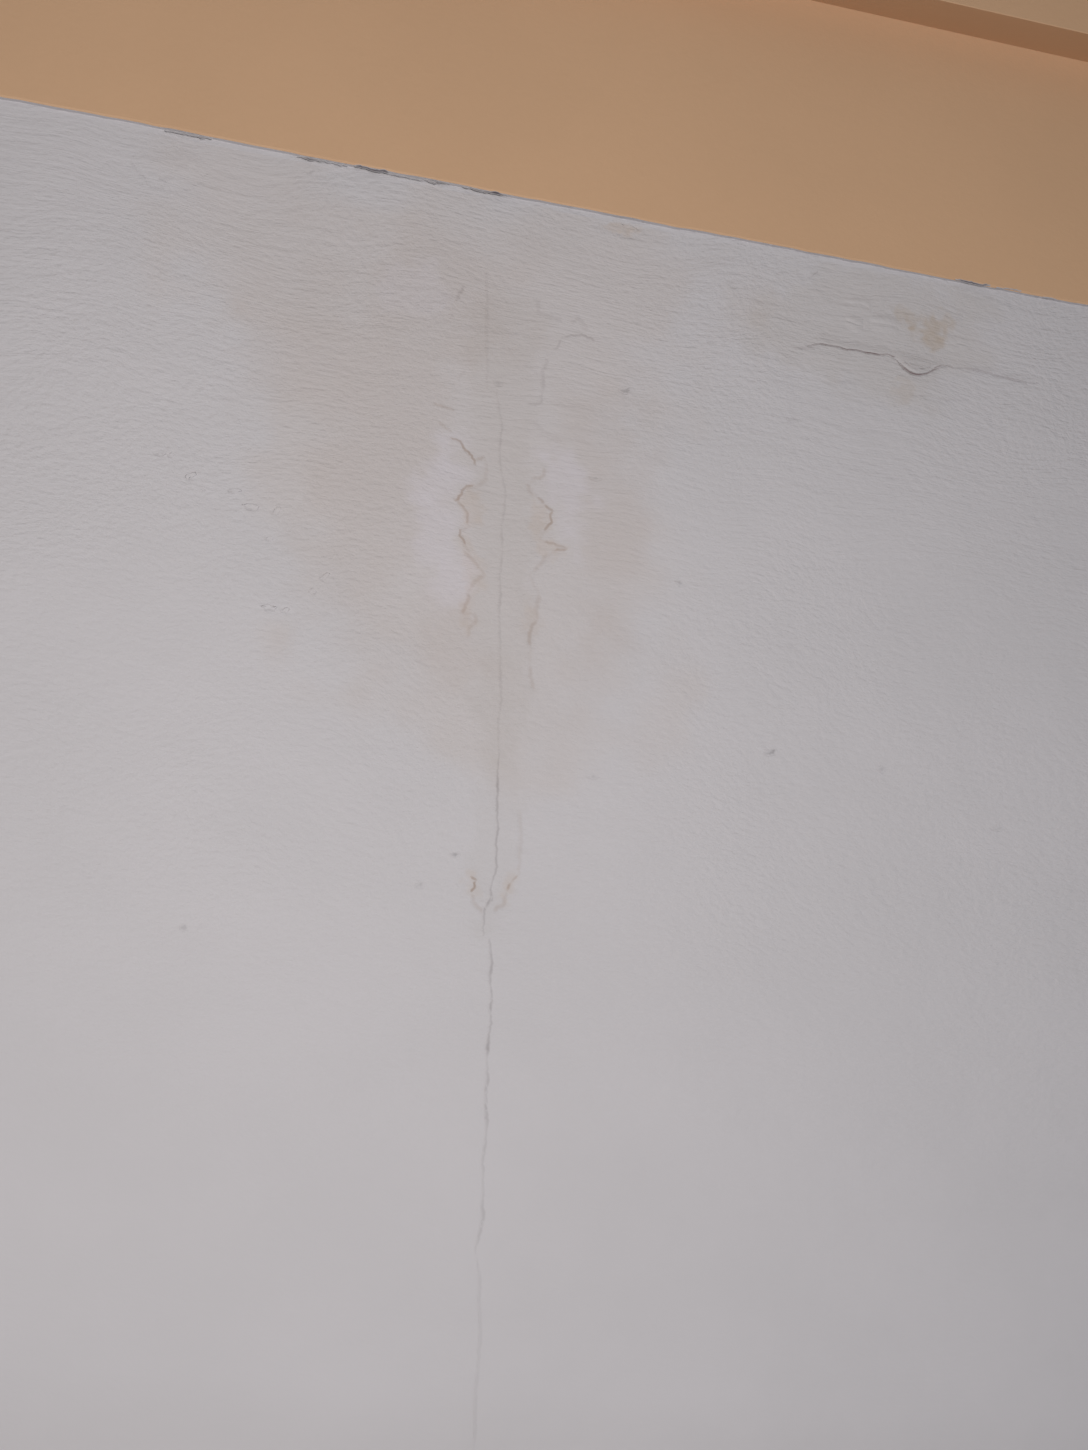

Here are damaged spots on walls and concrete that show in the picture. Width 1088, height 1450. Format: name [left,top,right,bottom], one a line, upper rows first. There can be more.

leakage [114,128,761,949]
crack [472,268,507,1450]